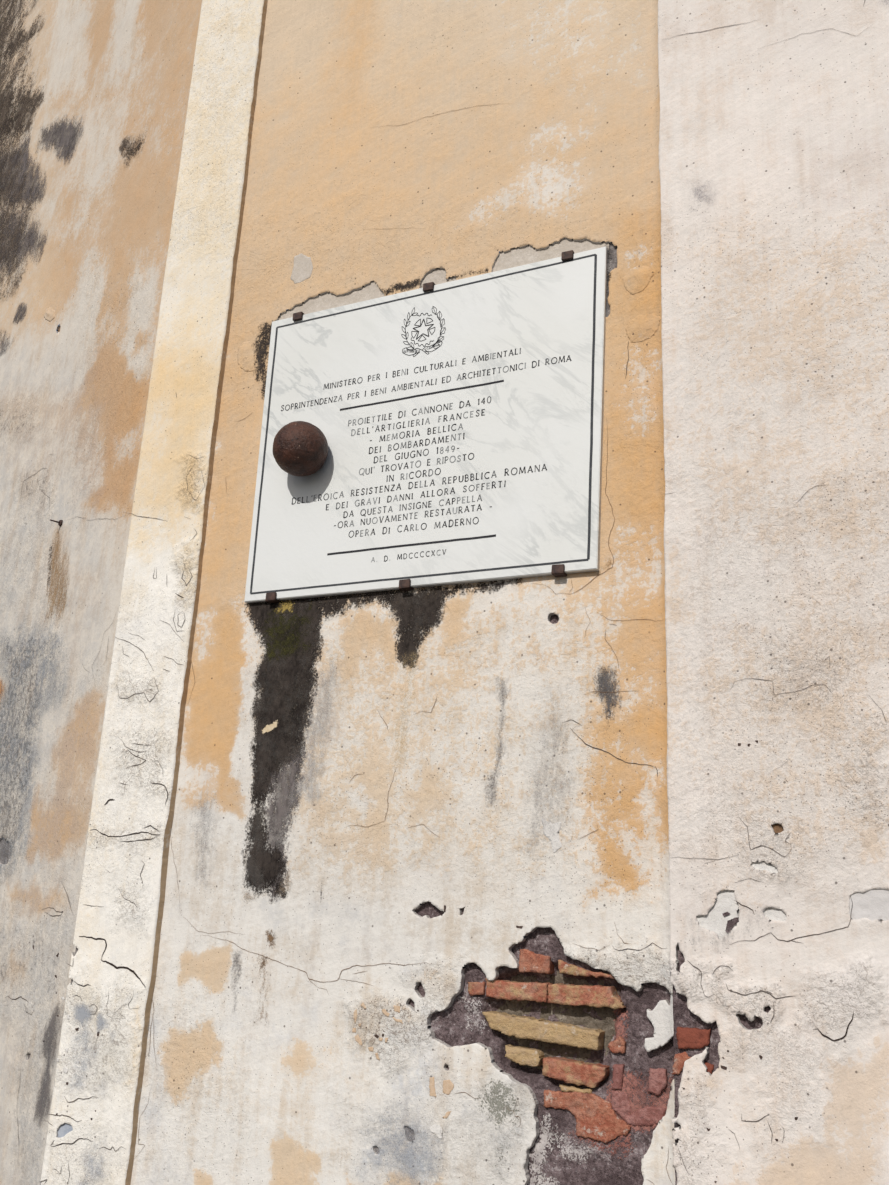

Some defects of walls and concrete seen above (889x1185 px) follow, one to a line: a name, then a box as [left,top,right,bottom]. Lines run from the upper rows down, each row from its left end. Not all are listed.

damp [0,0,83,356]
flaking render [278,281,384,320]
flaking render [421,268,456,288]
flaking render [492,239,618,317]
crack [531,417,663,693]
damp [243,578,522,902]
crack [562,720,658,777]
spalling [697,890,739,940]
peeling [763,908,787,921]
crack [17,741,426,1185]
spalling [417,926,729,1185]